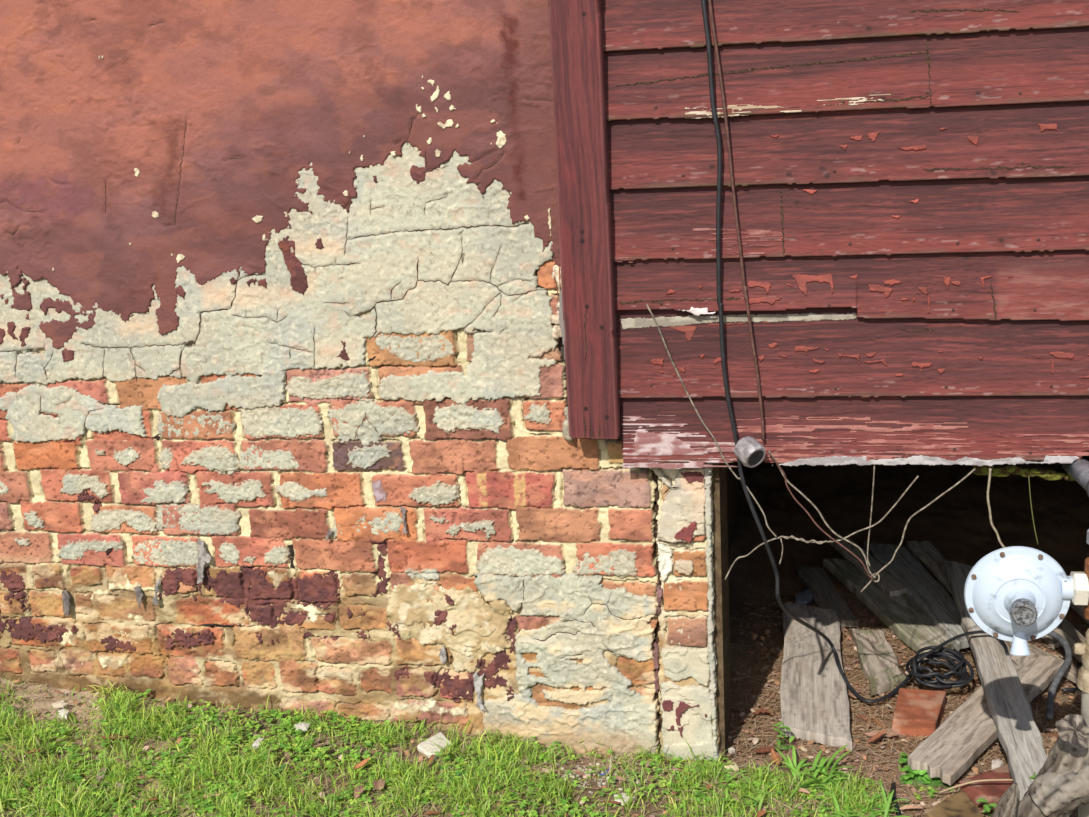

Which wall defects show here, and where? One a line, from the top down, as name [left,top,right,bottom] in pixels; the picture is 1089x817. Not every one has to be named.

peeling [416,76,459,129]
crack [396,113,504,176]
peeling [490,119,506,149]
peeling [685,104,802,119]
peeling [817,94,891,105]
crack [301,195,540,337]
peeling [620,281,857,341]
peeling [0,138,562,646]
crack [532,471,688,732]
flaking render [325,414,1089,764]
peeling [101,635,136,653]
peeling [165,628,215,650]